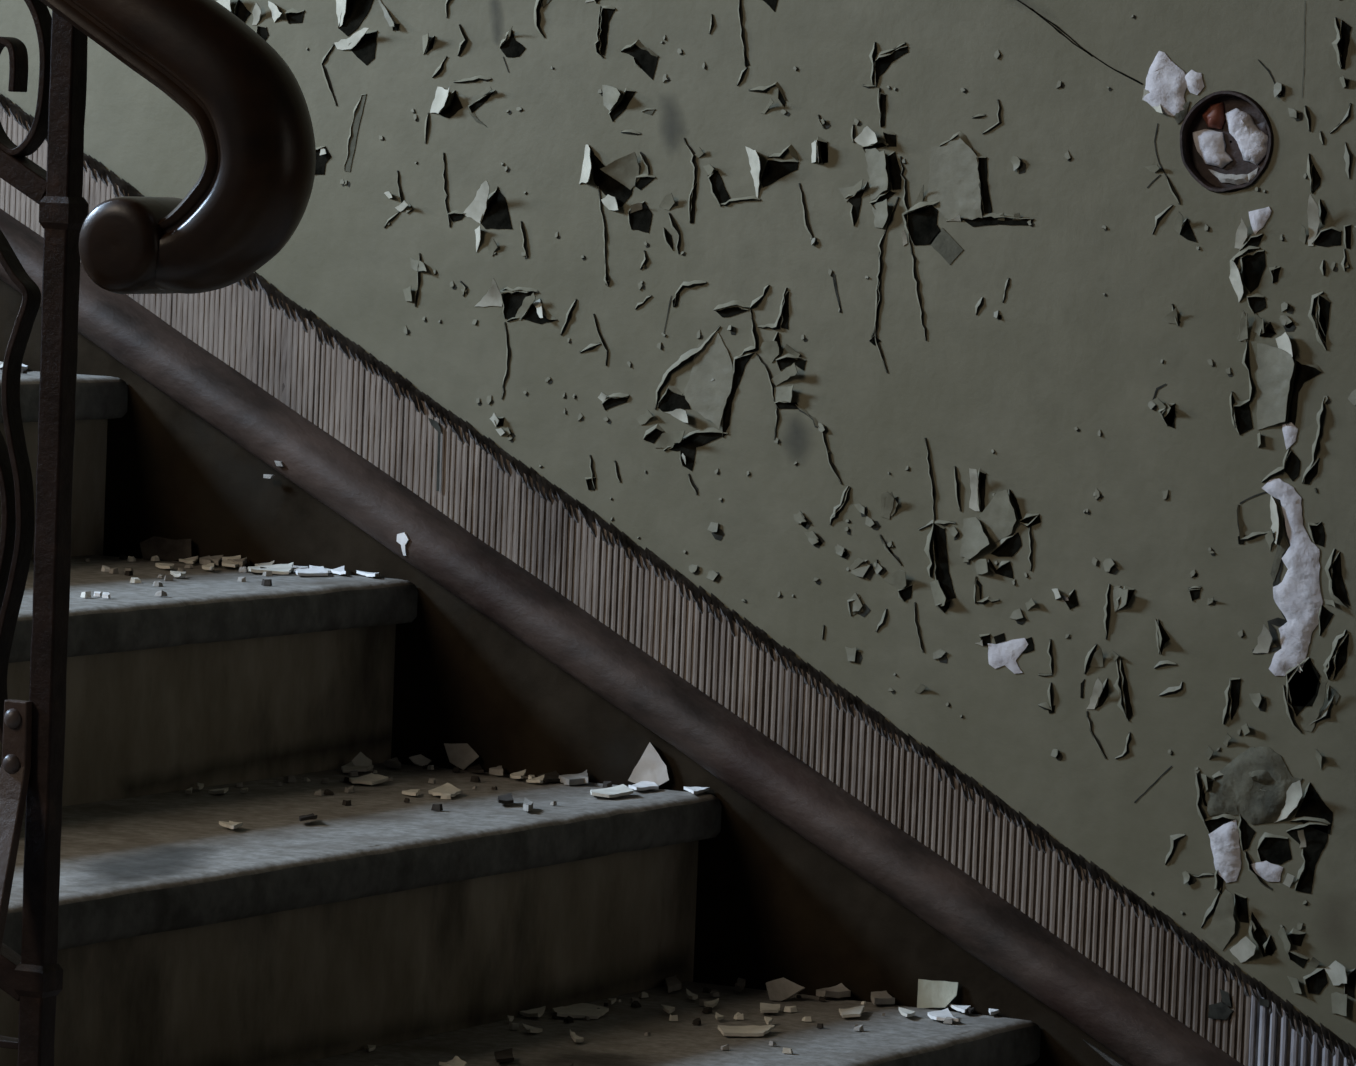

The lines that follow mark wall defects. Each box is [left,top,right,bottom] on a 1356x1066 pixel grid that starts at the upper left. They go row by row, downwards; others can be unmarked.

peeling [321,0,400,106]
peeling [442,153,528,258]
peeling [579,144,681,285]
peeling [703,114,831,206]
peeling [838,42,1034,342]
flaking render [1142,51,1205,124]
peeling [403,253,557,443]
peeling [636,284,808,495]
peeling [918,438,1041,613]
flaking render [1207,153,1356,733]
peeling [590,742,669,798]
flaking render [1195,677,1356,1020]